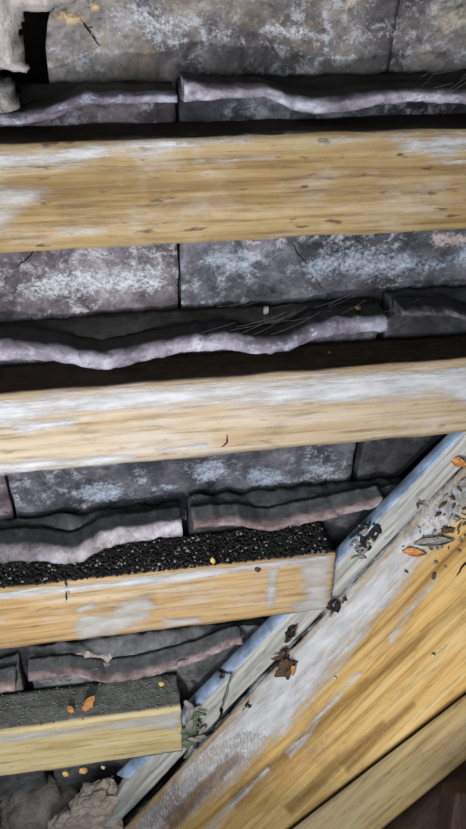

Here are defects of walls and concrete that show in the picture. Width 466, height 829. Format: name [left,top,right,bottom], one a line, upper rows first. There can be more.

water stain [57,13,81,25]
water stain [91,3,200,39]
water stain [260,23,314,38]
water stain [435,7,466,33]
water stain [28,250,166,299]
water stain [205,252,255,271]
water stain [303,250,416,279]
water stain [0,368,466,432]
water stain [0,456,129,473]
water stain [195,461,225,481]
water stain [248,469,284,487]
water stain [0,474,466,829]